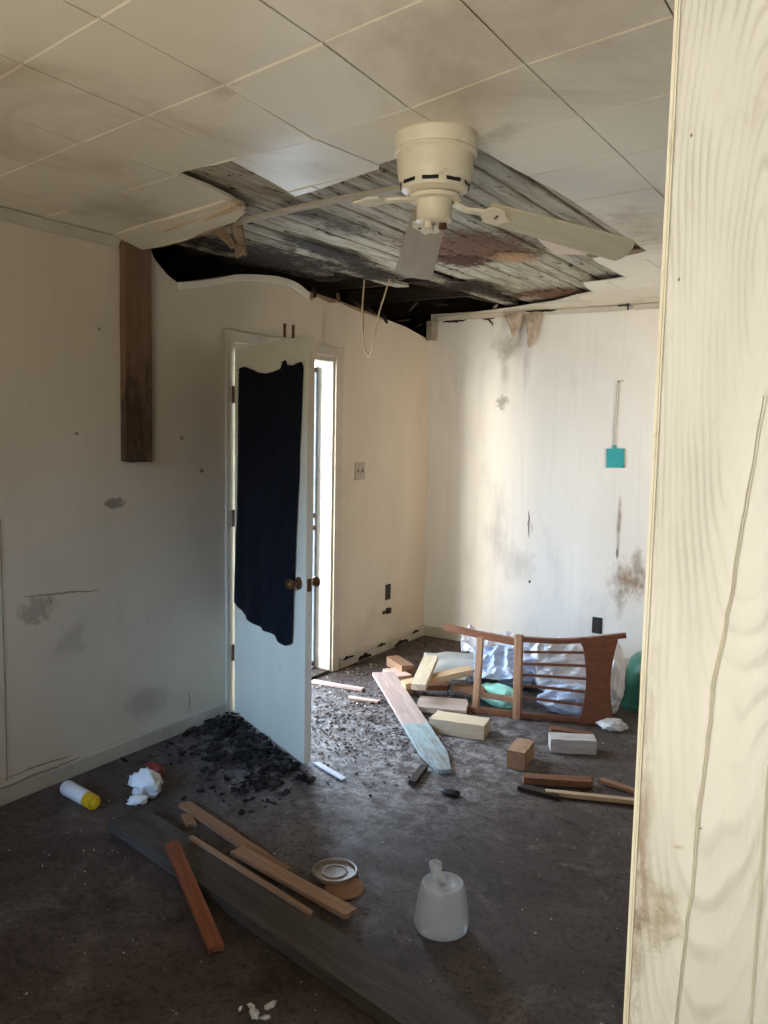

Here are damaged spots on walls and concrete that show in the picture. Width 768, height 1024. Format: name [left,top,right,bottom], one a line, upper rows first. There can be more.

crack [24,590,98,607]